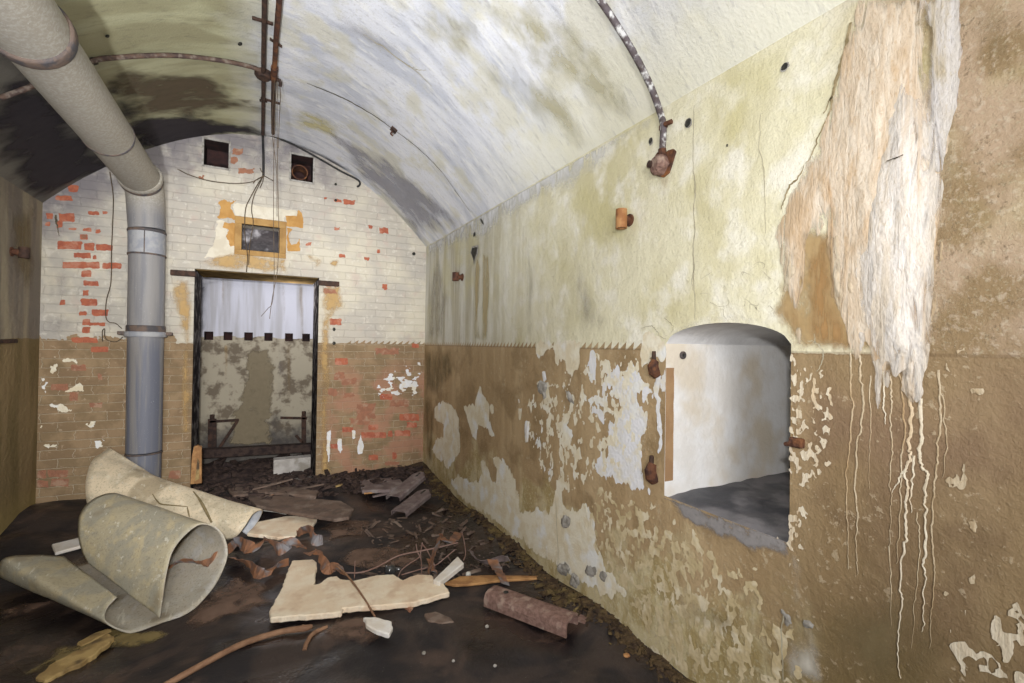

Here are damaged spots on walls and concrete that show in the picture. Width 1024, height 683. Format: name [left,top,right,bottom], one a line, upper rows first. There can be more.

flaking render [45,185,122,352]
peeling [217,200,236,246]
peeling [286,210,312,251]
flaking render [42,358,103,412]
flaking render [326,358,421,466]
peeling [789,354,833,487]
damp [775,0,963,679]
peeling [432,331,814,683]
peeling [949,602,1024,683]